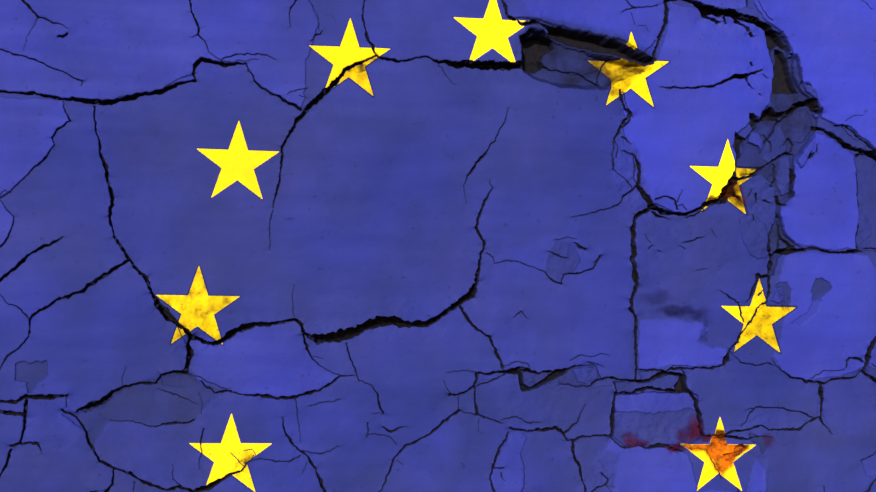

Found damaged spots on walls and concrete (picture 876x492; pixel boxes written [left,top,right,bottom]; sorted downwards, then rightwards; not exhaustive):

peeling [517,19,657,90]
crack [621,0,788,60]
crack [661,69,763,90]
spalling [734,30,824,307]
peeling [855,153,876,252]
crack [0,0,611,492]
crack [489,89,876,492]
peeling [811,278,832,300]
rust [666,421,748,473]